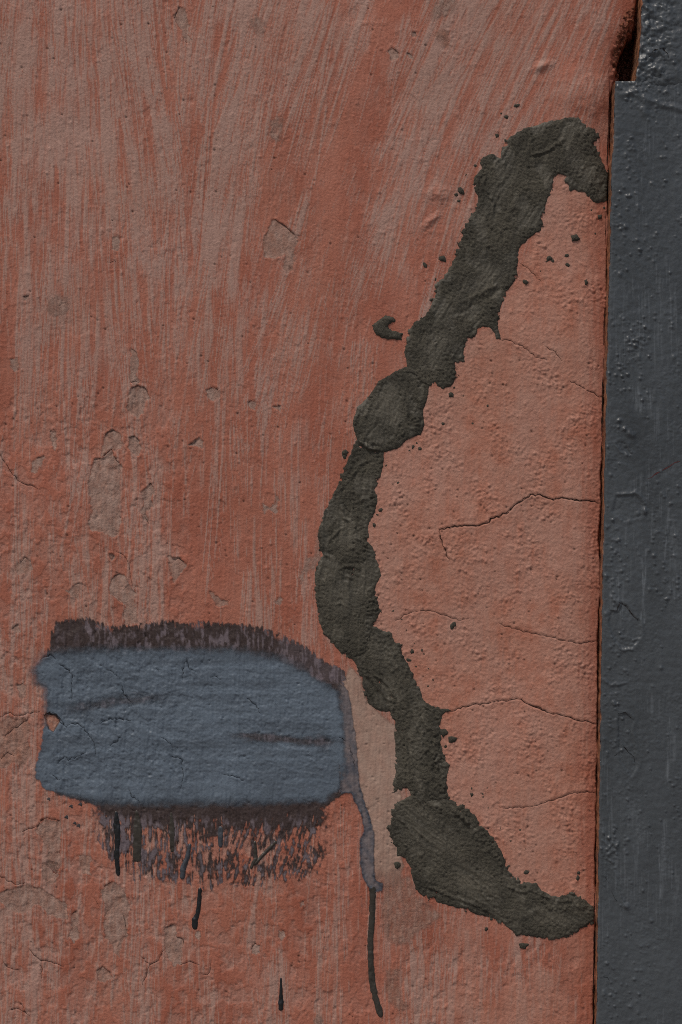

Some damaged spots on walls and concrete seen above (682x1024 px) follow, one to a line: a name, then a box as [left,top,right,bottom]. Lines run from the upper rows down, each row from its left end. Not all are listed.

crack [604,96,612,163]
crack [581,380,603,455]
peeling [88,429,142,537]
crack [439,494,600,550]
crack [590,893,598,1013]